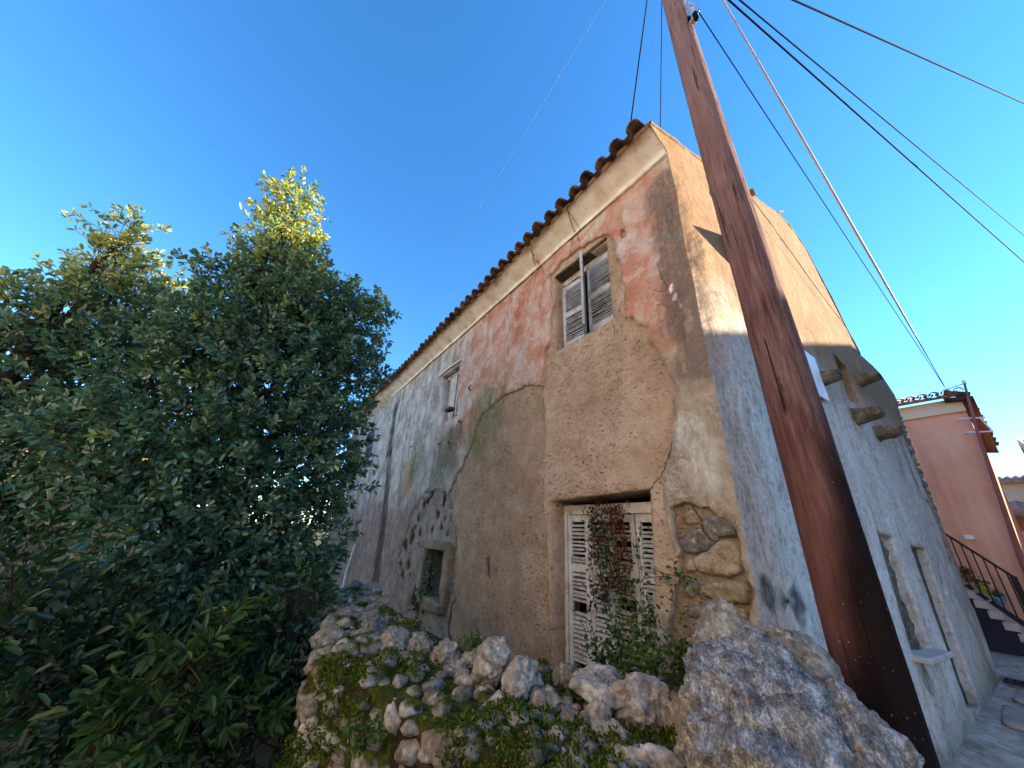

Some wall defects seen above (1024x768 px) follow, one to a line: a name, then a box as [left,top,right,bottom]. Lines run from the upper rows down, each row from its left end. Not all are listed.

peeling [396,231,677,671]
crack [651,443,672,488]
spalling [670,502,756,658]